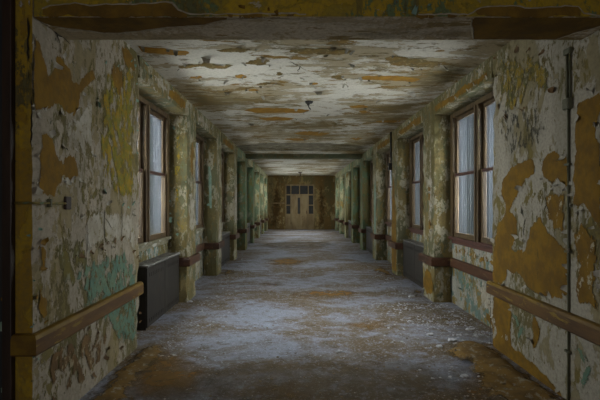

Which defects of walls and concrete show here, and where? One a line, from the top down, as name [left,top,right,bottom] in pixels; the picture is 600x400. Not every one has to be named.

flaking render [35,1,313,34]
peeling [217,46,270,66]
peeling [290,47,355,57]
peeling [357,55,449,83]
peeling [244,108,309,121]
peeling [32,34,233,306]
peeling [456,88,600,310]
peeling [50,299,142,390]
peeling [456,269,562,397]